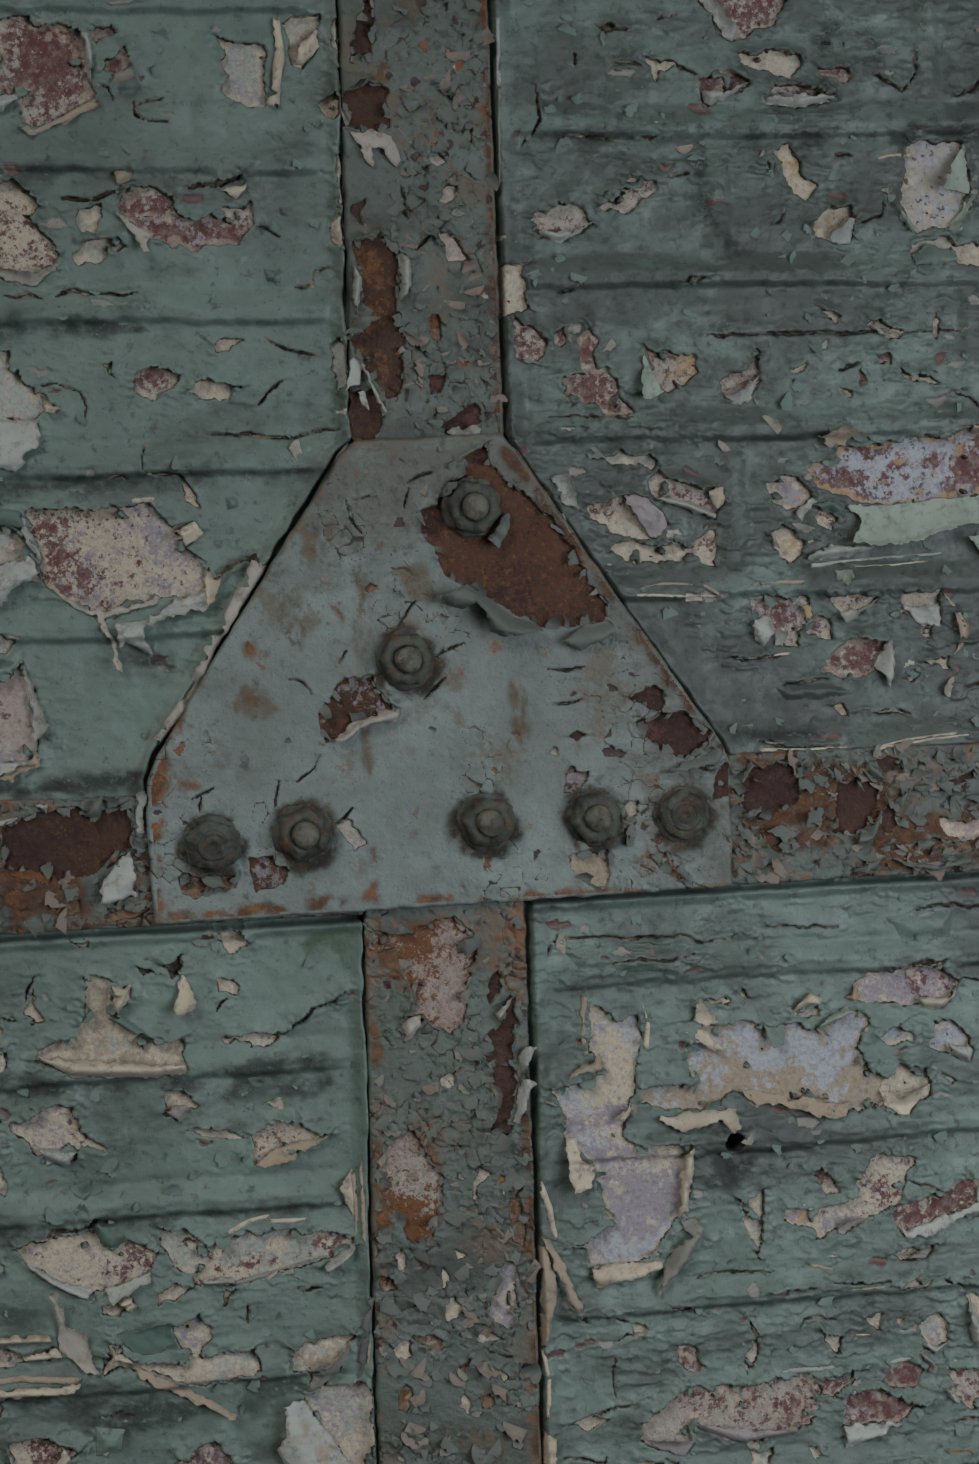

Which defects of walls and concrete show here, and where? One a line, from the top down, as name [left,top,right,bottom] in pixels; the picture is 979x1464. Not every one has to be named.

corrosion [341,0,401,167]
corrosion [340,199,412,440]
peeling [386,0,697,436]
peeling [877,141,979,267]
peeling [0,453,258,672]
corrosion [0,758,288,931]
corrosion [415,388,616,651]
peeling [551,445,725,575]
corrosion [630,627,979,874]
peeling [716,422,979,884]
corrosion [363,896,537,1172]
peeling [0,930,979,1464]